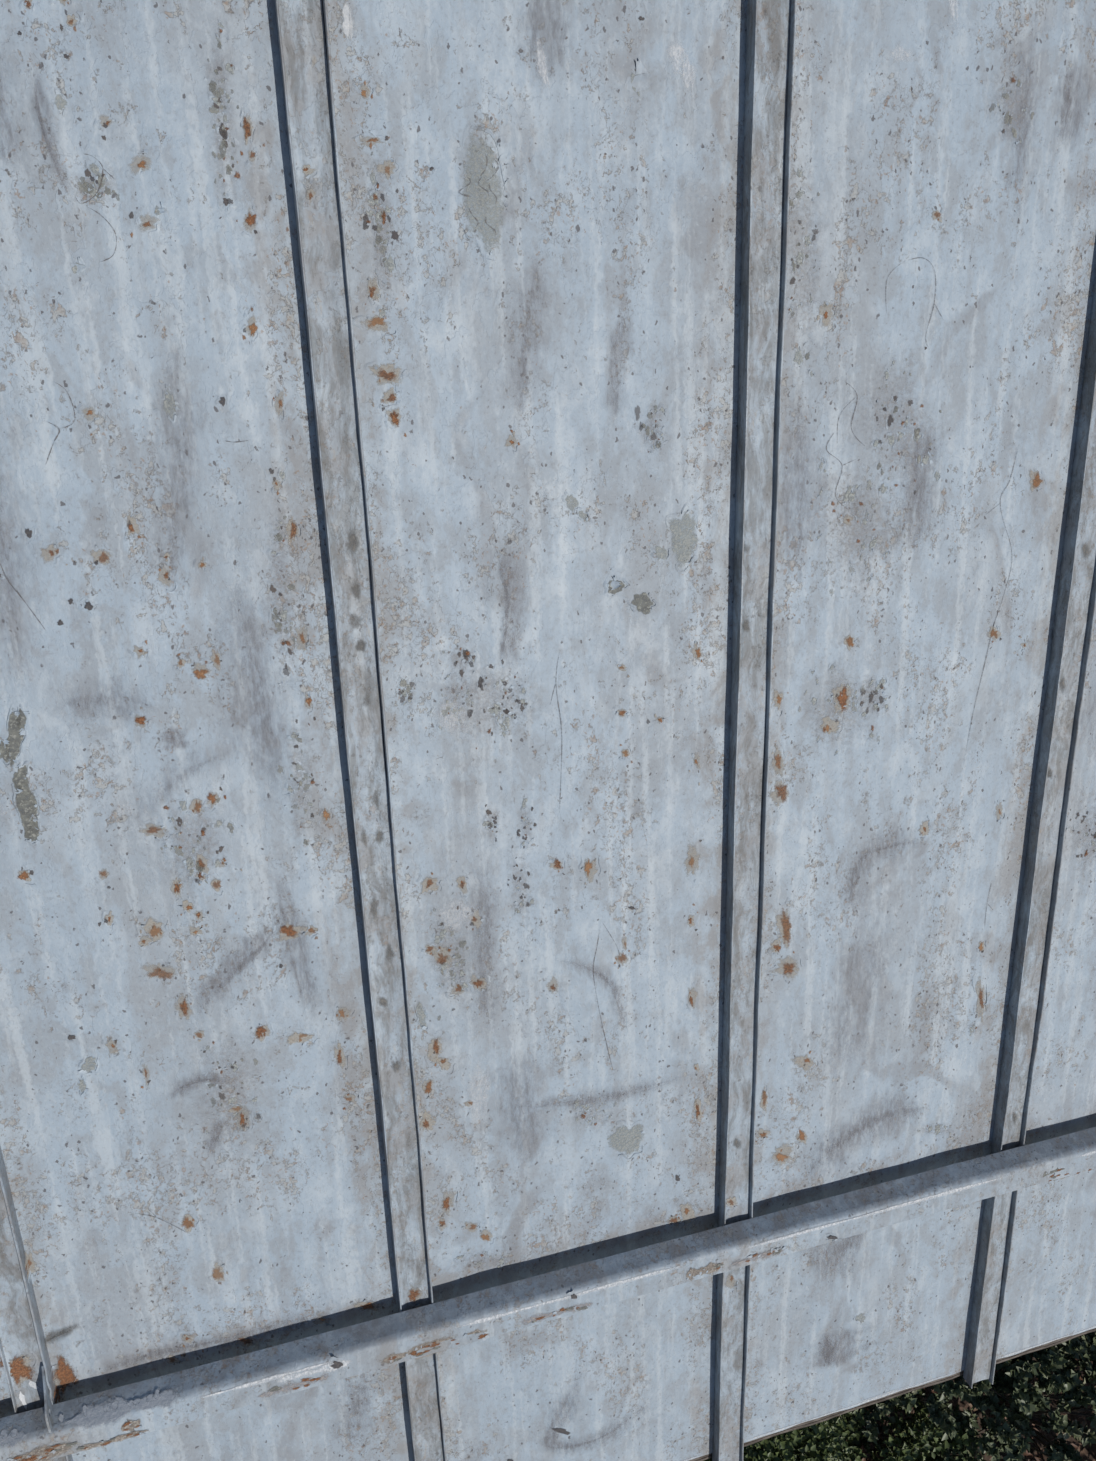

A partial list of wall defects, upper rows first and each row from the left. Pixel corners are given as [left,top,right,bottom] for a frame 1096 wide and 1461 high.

peeling [77,159,116,202]
peeling [459,124,510,264]
peeling [651,503,699,574]
peeling [603,576,659,614]
peeling [0,704,42,846]
corrosion [186,784,226,821]
corrosion [135,847,242,982]
corrosion [270,920,320,948]
corrosion [421,938,493,999]
corrosion [169,990,204,1042]
peeling [572,1094,645,1161]
corrosion [0,1350,78,1404]